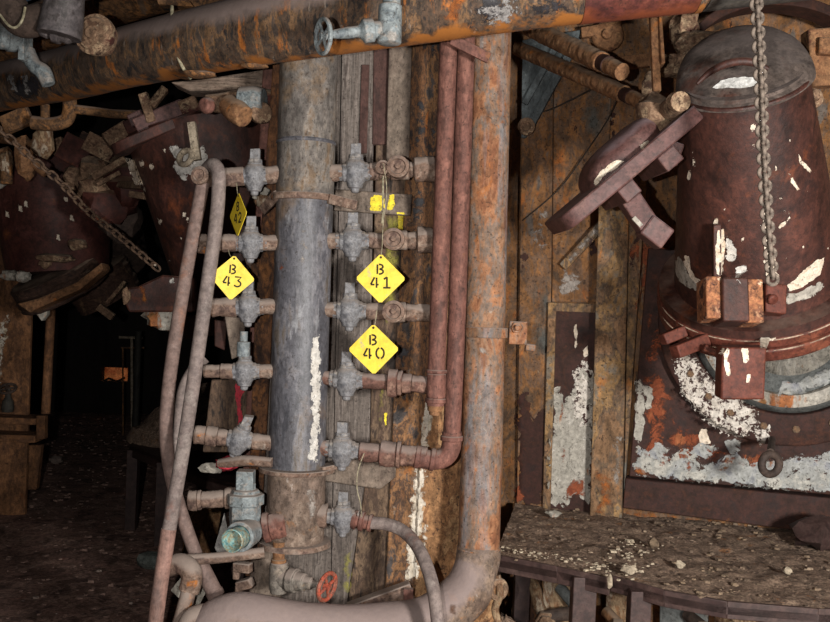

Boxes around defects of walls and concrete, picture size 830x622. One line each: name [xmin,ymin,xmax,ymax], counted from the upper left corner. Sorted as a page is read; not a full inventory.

leakage [421,403,433,447]
peeling [501,325,830,608]
leakage [408,468,428,545]
leakage [405,545,420,580]